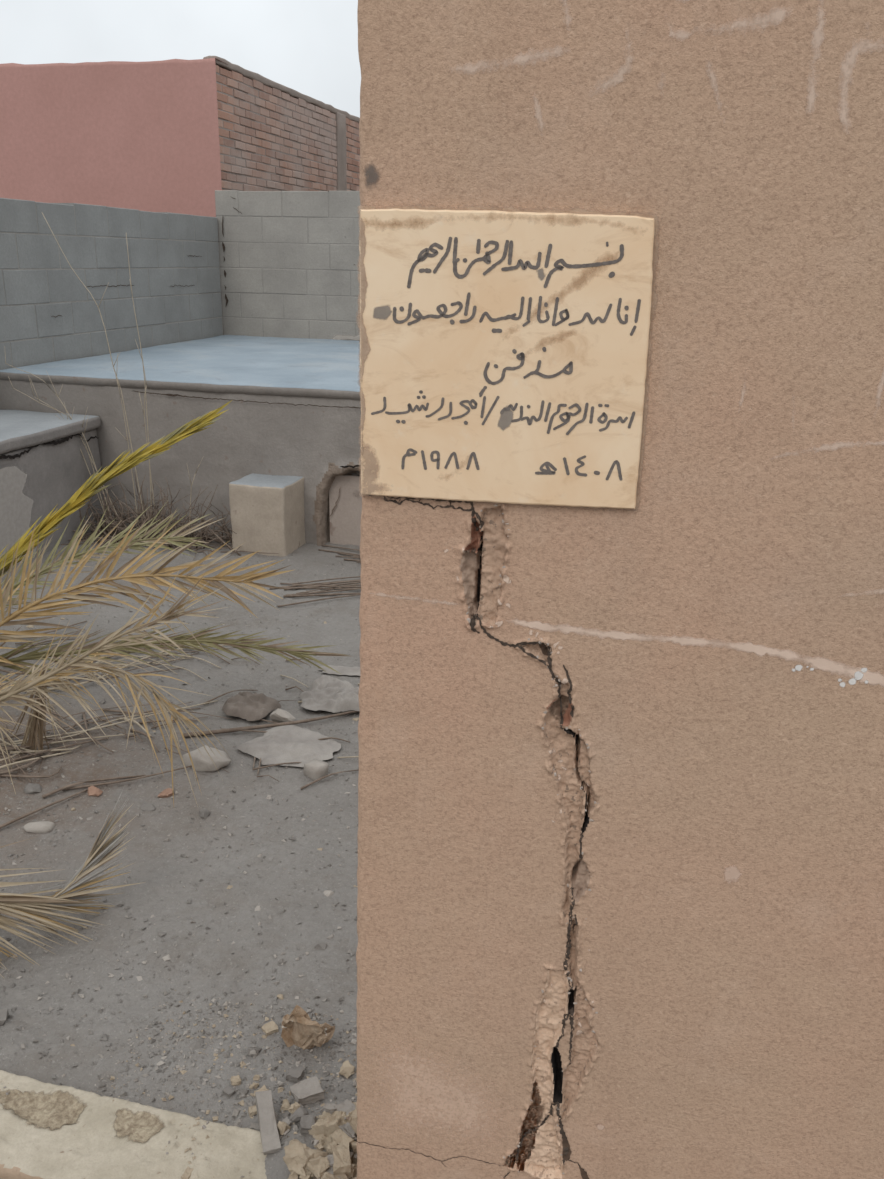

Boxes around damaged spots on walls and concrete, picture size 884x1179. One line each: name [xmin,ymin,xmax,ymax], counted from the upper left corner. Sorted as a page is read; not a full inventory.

crack [0,433,98,459]
crack [329,465,360,518]
crack [368,495,589,859]
spalling [457,504,884,1179]
crack [356,887,587,1178]